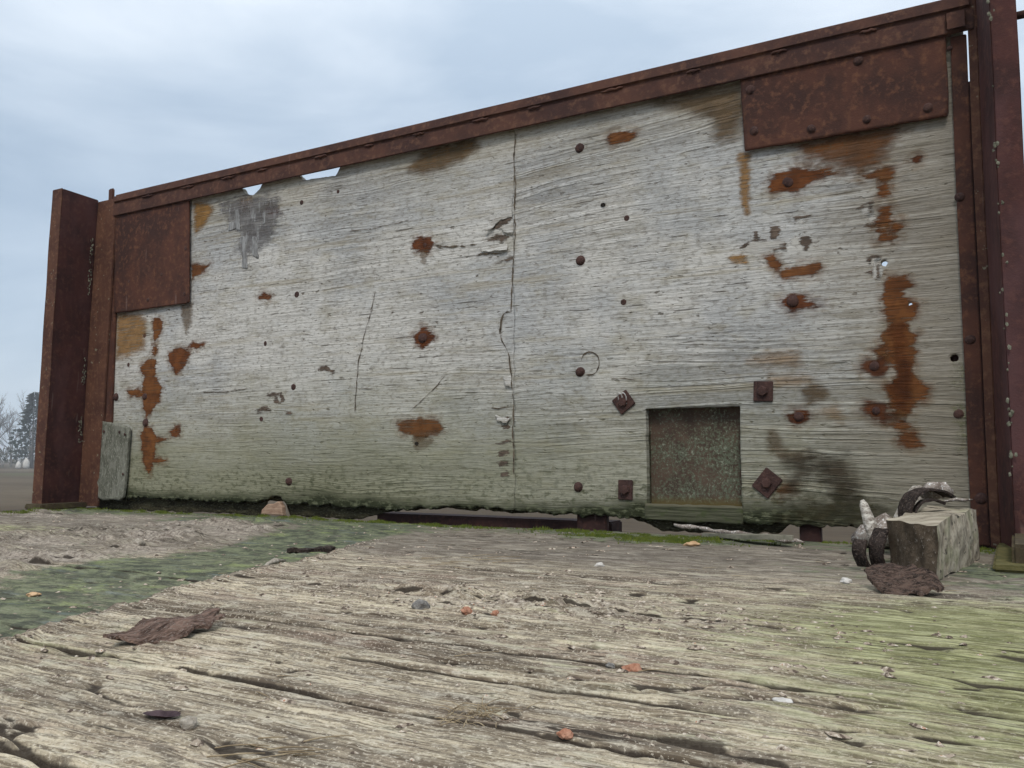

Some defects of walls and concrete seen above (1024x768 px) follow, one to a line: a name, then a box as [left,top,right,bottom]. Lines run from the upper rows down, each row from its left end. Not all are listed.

rust [606,131,637,145]
rust [736,153,750,215]
rust [768,128,904,242]
rust [411,236,434,253]
rust [764,254,822,280]
crack [435,138,525,473]
crack [353,294,375,409]
rust [412,327,435,349]
rust [860,275,931,448]
rust [127,317,205,474]
rust [396,417,443,438]